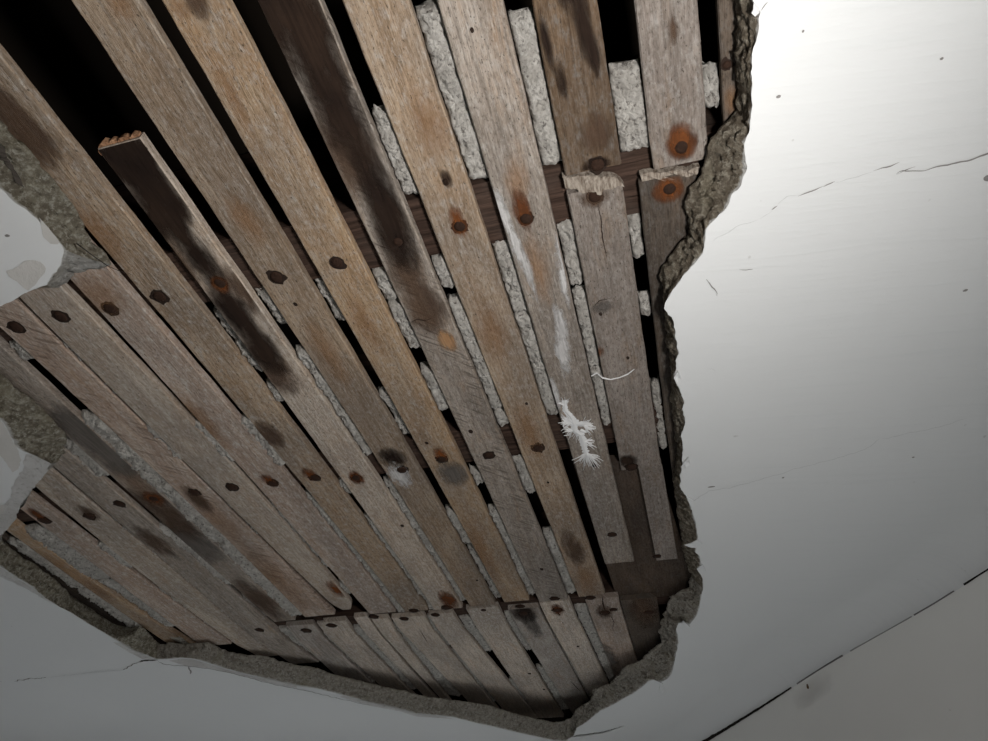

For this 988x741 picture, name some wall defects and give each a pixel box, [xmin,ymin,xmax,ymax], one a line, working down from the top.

leakage [540,22,566,95]
leakage [562,0,600,76]
leakage [258,0,445,331]
rust [513,192,531,226]
rust [668,126,696,157]
crack [717,153,988,238]
leakage [99,139,295,392]
flaking render [0,0,760,741]
leakage [558,397,603,470]
rust [440,593,457,607]
crack [702,569,988,741]